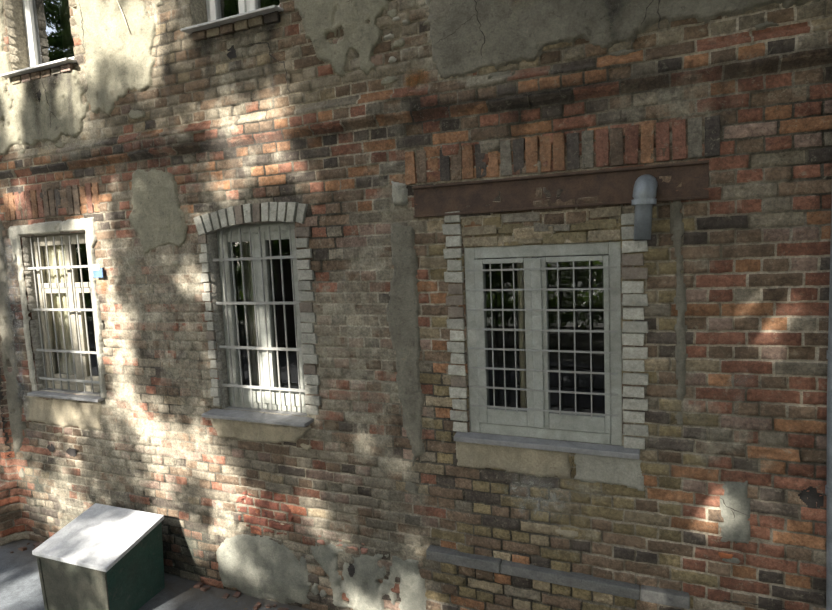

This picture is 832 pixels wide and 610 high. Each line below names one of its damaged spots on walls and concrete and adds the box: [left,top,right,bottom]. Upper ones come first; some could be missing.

peeling [0,0,164,155]
peeling [294,0,410,77]
peeling [423,0,820,80]
peeling [129,168,188,254]
peeling [0,219,102,455]
peeling [216,491,427,610]